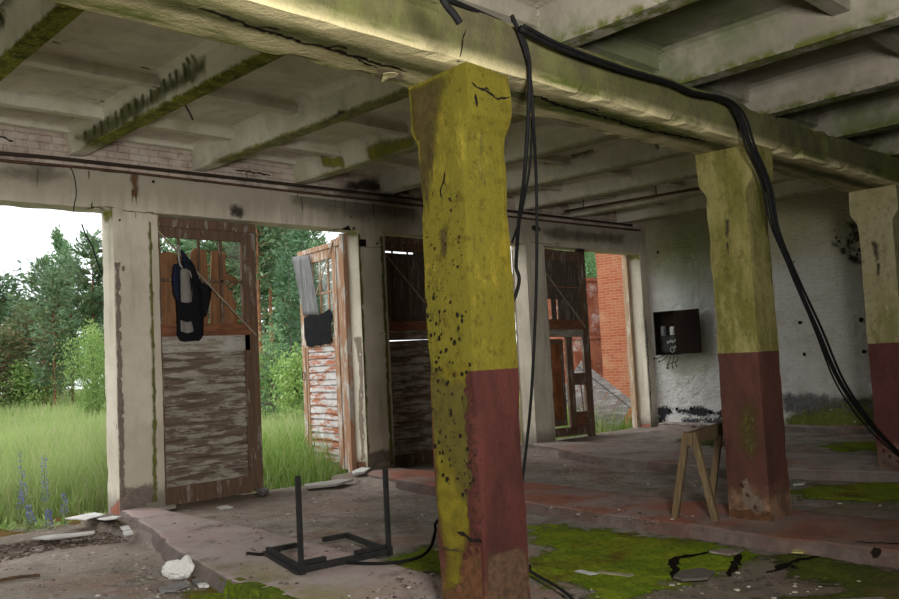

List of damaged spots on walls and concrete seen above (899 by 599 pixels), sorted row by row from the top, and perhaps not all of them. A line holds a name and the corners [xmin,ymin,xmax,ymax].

crack [198,8,407,72]
water stain [82,56,205,144]
crack [472,82,705,142]
water stain [833,222,862,264]
crack [667,551,709,578]
crack [726,554,742,577]
crack [765,556,820,573]